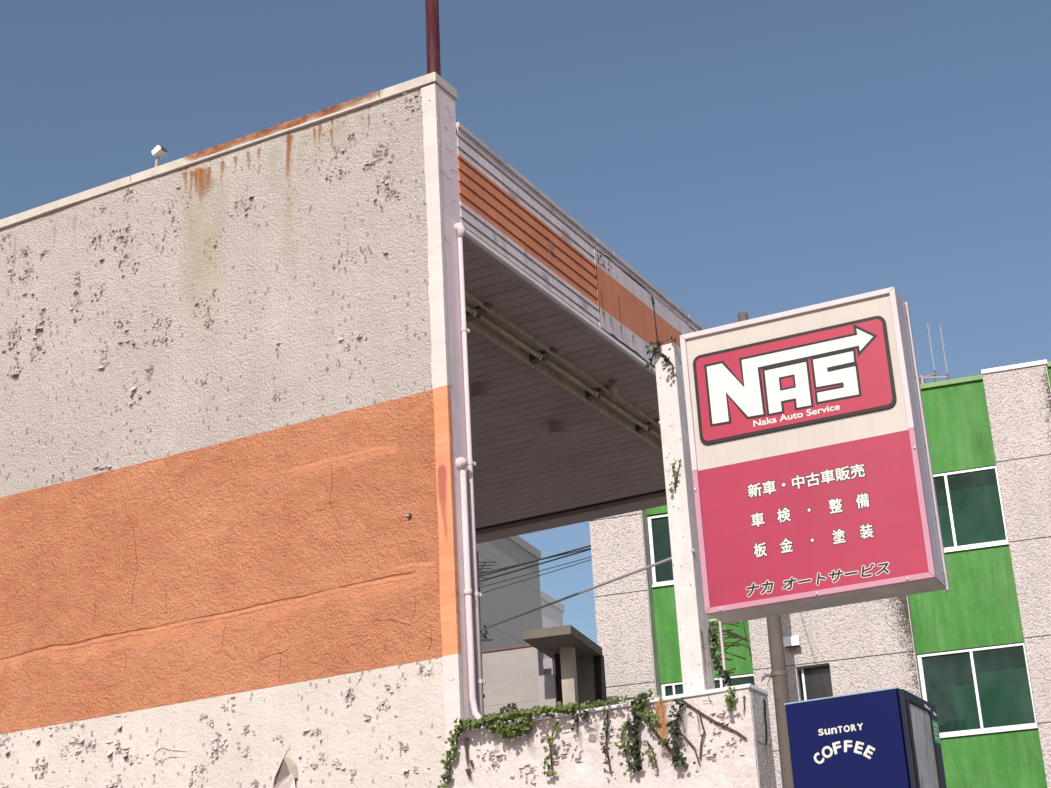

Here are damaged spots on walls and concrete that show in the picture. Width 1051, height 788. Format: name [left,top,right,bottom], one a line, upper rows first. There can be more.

rust [183,91,377,182]
peeling [363,140,401,213]
peeling [89,187,189,280]
peeling [1,232,52,381]
peeling [69,271,105,324]
peeling [98,305,172,368]
crack [594,248,658,368]
crack [1,567,433,690]
peeling [363,663,431,723]
peeling [30,716,164,779]
peeling [188,696,255,788]
peeling [236,727,357,788]